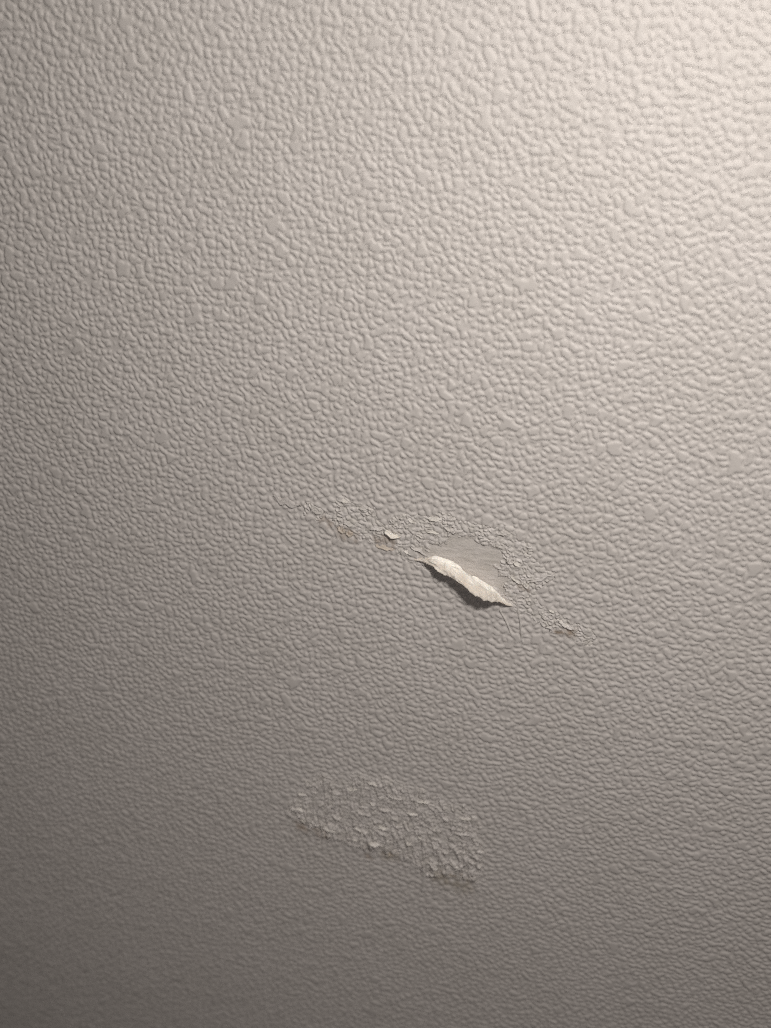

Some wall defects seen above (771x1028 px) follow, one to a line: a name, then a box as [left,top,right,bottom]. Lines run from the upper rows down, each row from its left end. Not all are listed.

peeling [370,526,513,607]